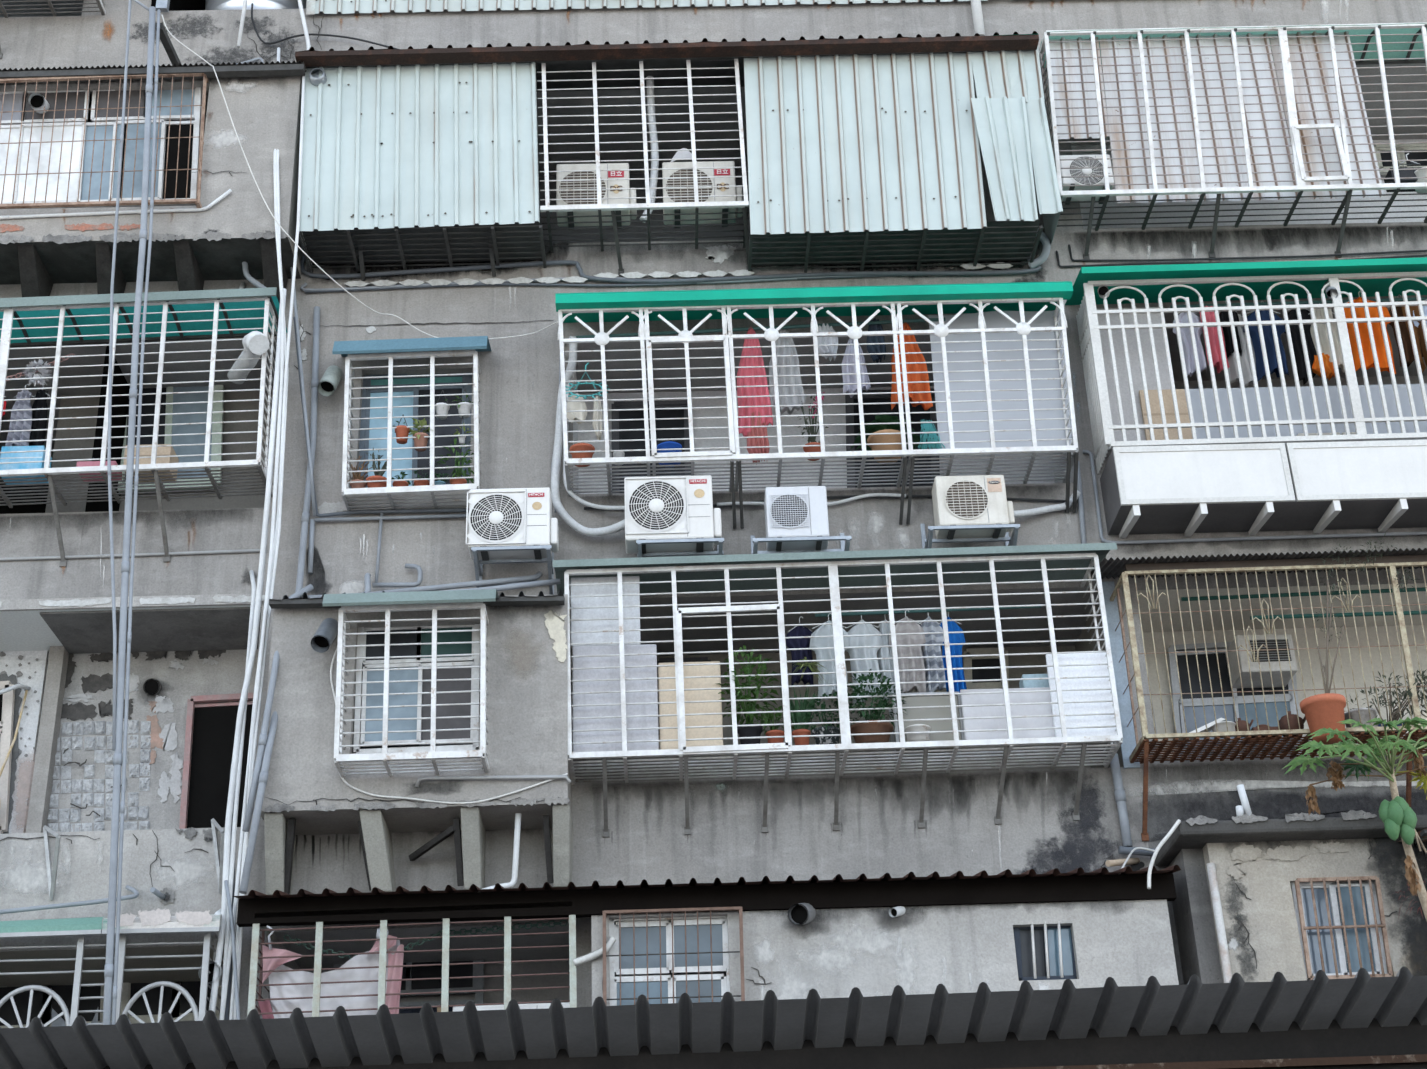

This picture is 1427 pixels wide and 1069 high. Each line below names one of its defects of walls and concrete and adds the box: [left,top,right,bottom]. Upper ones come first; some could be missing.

peeling [39,598,111,607]
peeling [140,597,195,605]
peeling [213,595,265,603]
peeling [0,651,40,834]
peeling [61,650,226,804]
spalling [175,827,213,842]
leakage [868,770,1118,874]
leakage [1129,758,1427,827]
leakage [4,845,70,894]
leakage [157,859,214,886]
leakage [1227,874,1255,980]
leakage [1361,837,1427,976]